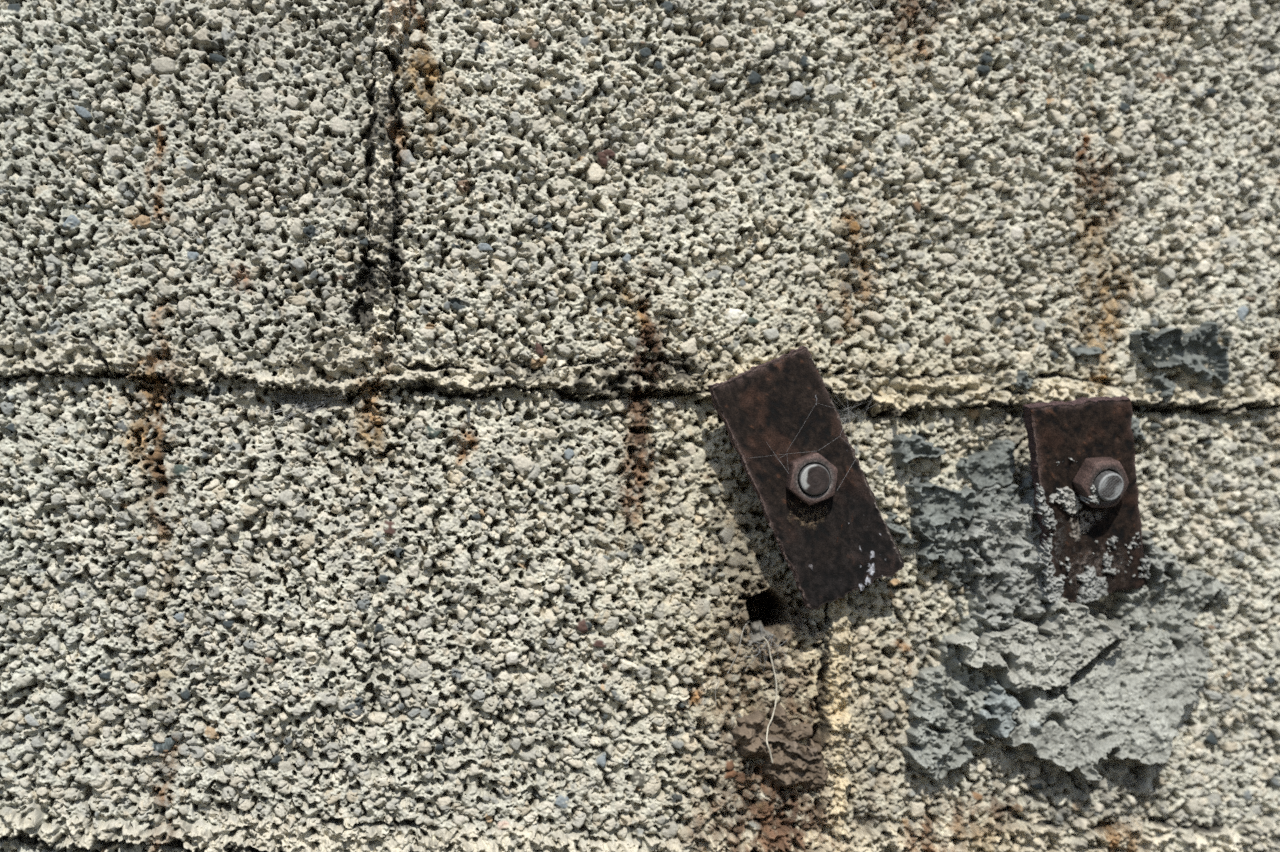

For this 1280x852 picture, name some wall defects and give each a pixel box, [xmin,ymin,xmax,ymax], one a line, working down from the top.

crack [342,0,710,401]
corrosion [619,300,659,520]
spalling [1076,599,1107,607]
corrosion [757,777,797,848]